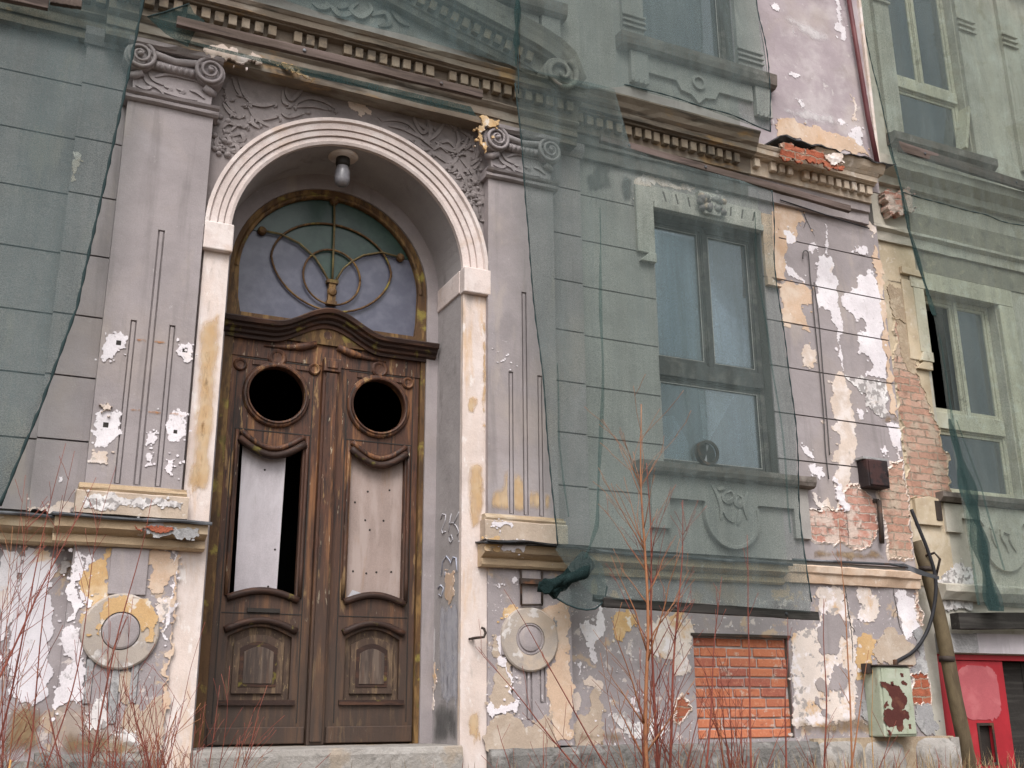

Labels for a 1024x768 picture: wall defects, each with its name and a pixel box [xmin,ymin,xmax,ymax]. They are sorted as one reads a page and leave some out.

peeling [771,93,870,165]
peeling [771,204,817,369]
flaking render [95,331,128,363]
flaking render [800,186,952,562]
flaking render [87,409,122,465]
flaking render [145,408,192,480]
peeling [27,489,183,523]
leakage [493,477,548,510]
peeling [0,546,183,754]
peeling [482,600,695,752]
peeling [788,585,881,736]
peeling [895,589,925,640]